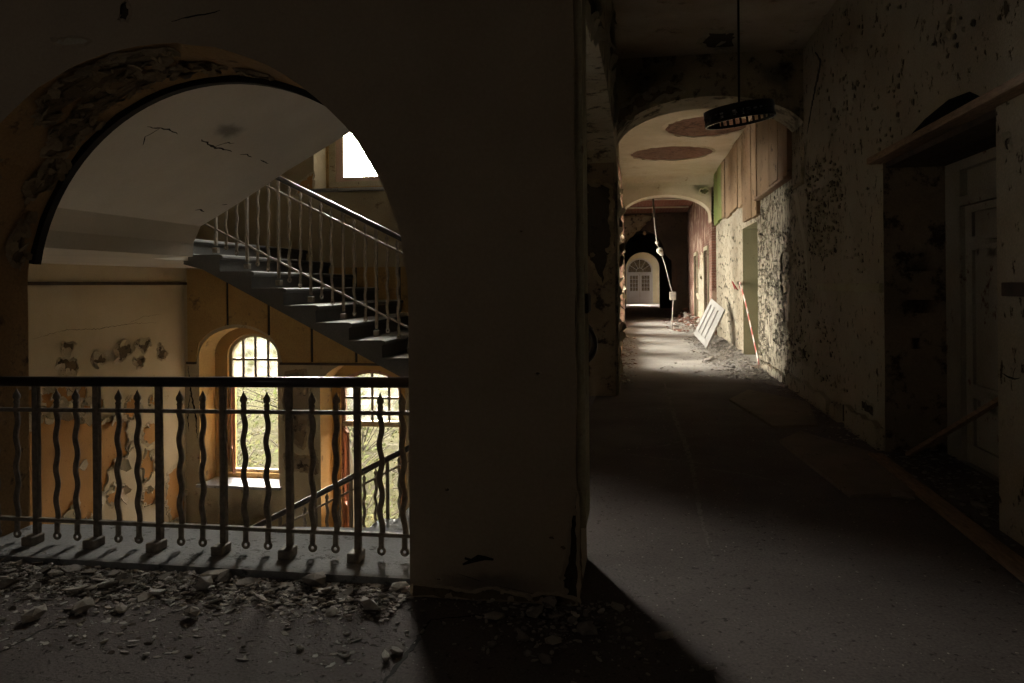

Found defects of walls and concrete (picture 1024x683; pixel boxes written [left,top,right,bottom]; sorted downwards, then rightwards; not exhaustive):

crack [201,139,269,164]
flaking render [627,114,751,161]
flaking render [587,177,627,376]
peeling [717,225,743,345]
flaking render [29,337,188,525]